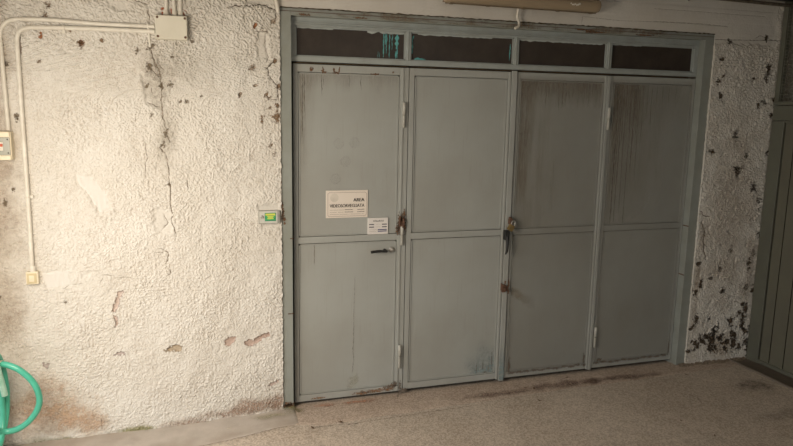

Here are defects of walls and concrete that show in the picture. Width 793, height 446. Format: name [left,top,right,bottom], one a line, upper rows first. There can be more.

crack [145,48,189,233]
spalling [112,290,124,326]
spalling [245,332,270,348]